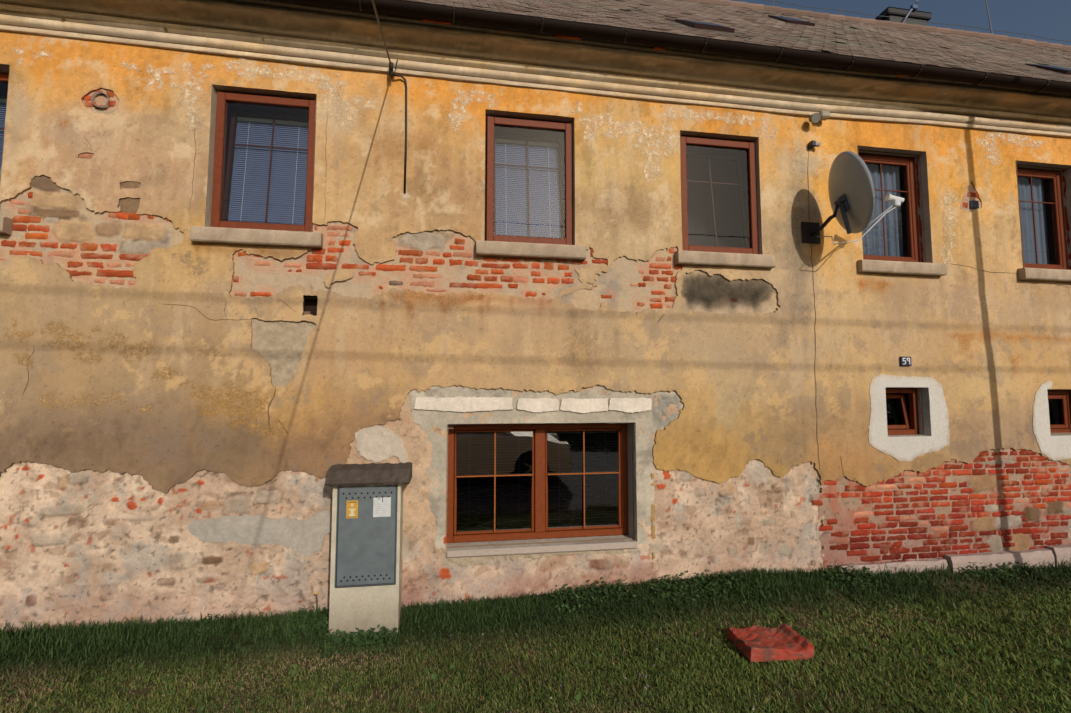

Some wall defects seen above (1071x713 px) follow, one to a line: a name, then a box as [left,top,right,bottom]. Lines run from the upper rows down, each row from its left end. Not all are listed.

spalling [0,175,203,288]
spalling [230,221,779,315]
leakage [685,276,769,304]
spalling [251,318,316,387]
spalling [0,461,333,632]
spalling [346,384,1071,607]